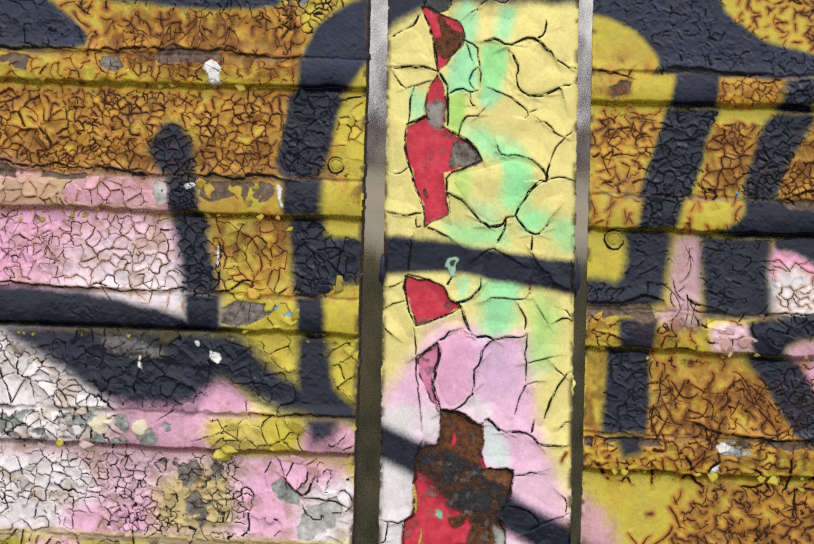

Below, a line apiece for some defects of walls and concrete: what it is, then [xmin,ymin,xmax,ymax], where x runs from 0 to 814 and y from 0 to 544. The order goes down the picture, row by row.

peeling [404,0,483,227]
peeling [209,335,221,364]
peeling [0,409,158,450]
peeling [157,445,238,528]